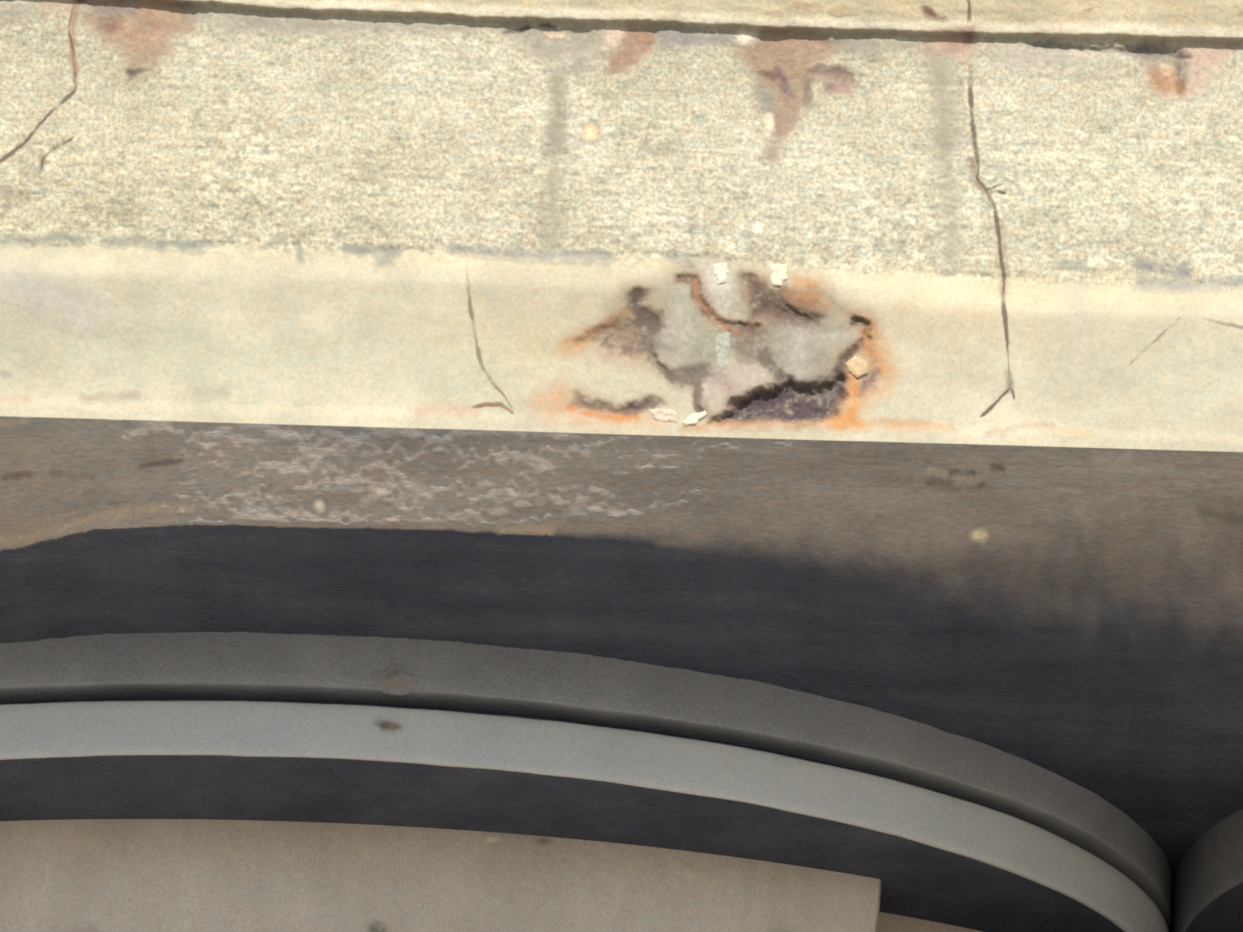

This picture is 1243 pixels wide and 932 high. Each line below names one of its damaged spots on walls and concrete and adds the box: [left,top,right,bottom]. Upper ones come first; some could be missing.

crack [0,0,83,175]
spalling [751,220,765,236]
crack [966,86,1016,417]
crack [465,268,514,414]
spalling [521,245,932,441]